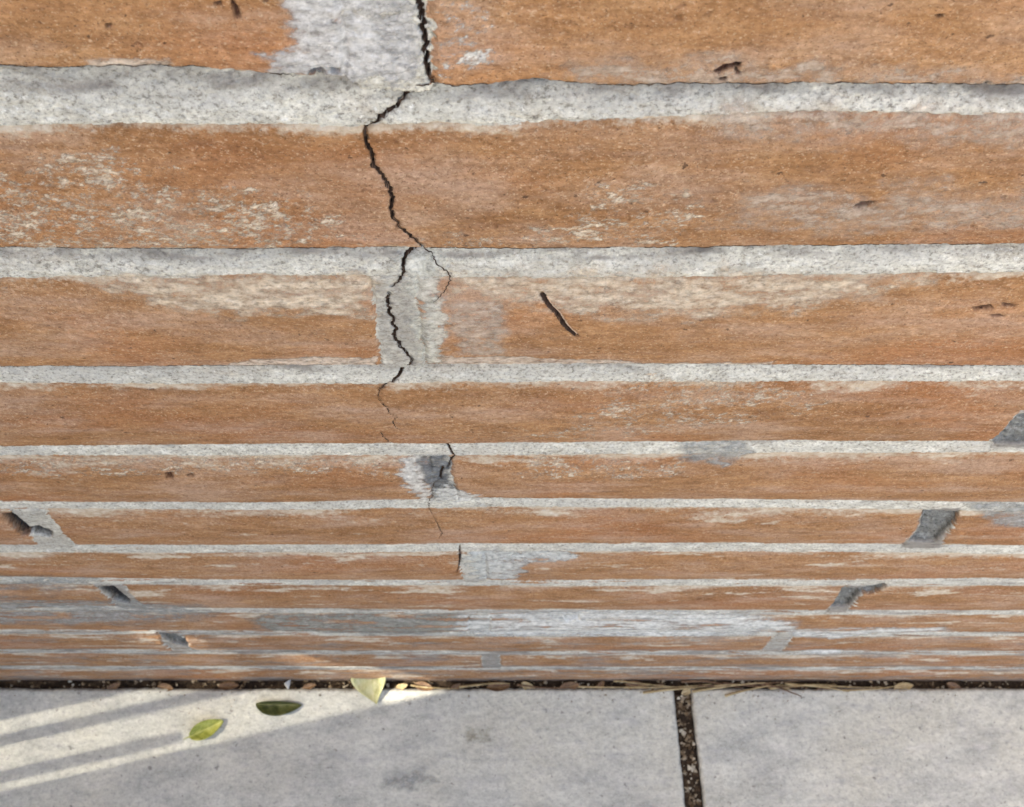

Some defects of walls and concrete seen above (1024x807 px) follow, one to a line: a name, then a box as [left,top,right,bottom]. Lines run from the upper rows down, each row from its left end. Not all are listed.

crack [558,79,1024,87]
crack [228,0,614,443]
crack [428,443,462,573]
peeling [6,512,49,531]
peeling [106,585,129,599]